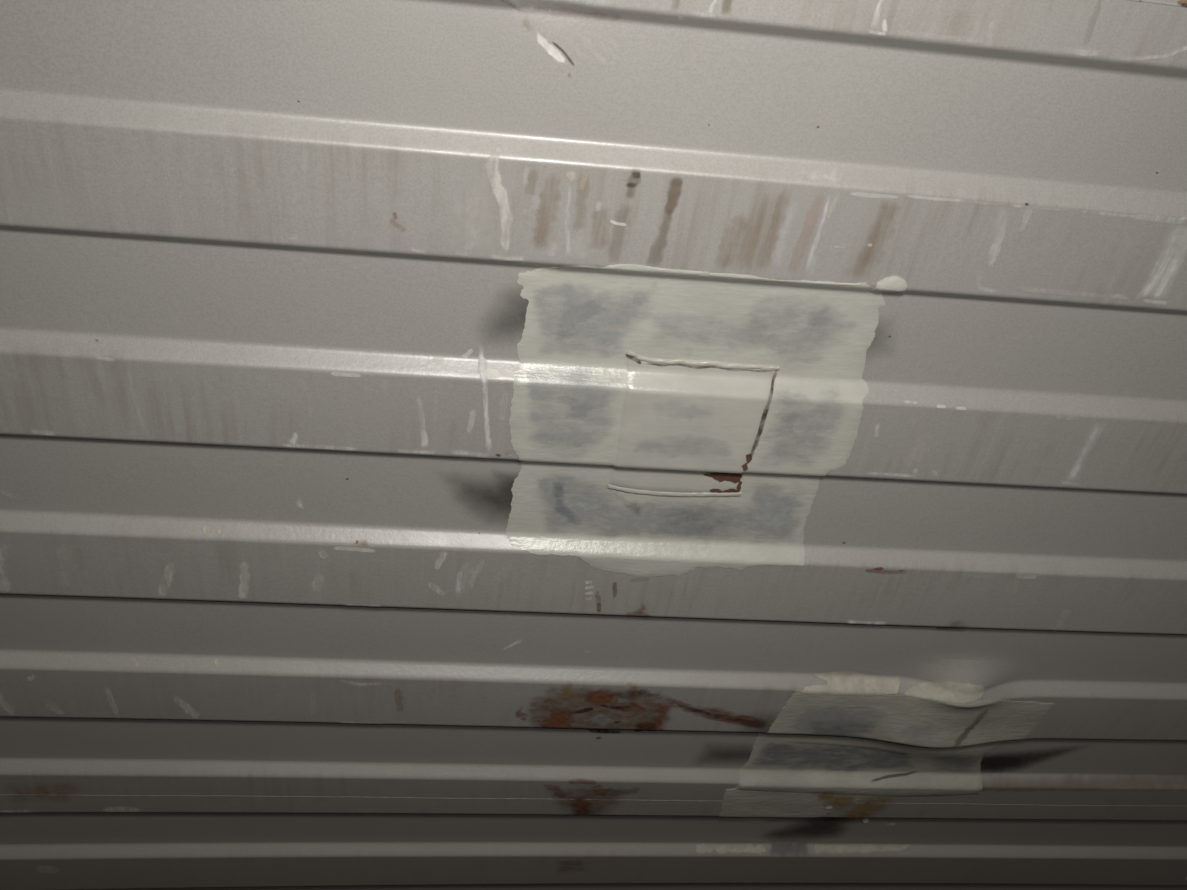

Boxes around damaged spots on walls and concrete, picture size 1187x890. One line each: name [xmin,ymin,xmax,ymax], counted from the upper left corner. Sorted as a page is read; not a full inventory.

leakage [667,179,682,213]
corrosion [704,454,752,493]
corrosion [537,691,762,739]